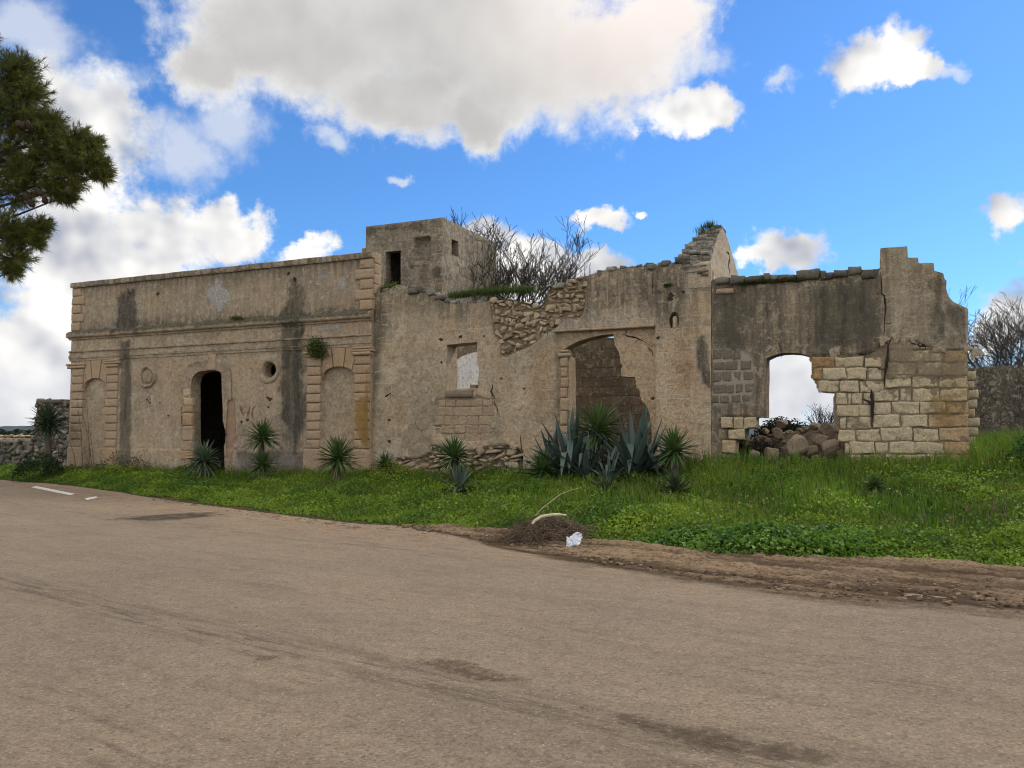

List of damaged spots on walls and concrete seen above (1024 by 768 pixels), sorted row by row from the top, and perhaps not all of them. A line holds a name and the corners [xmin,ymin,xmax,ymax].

damp [111,289,141,466]
damp [238,281,307,470]
peeling [711,346,759,454]
crack [858,272,927,425]
peeling [809,331,984,467]